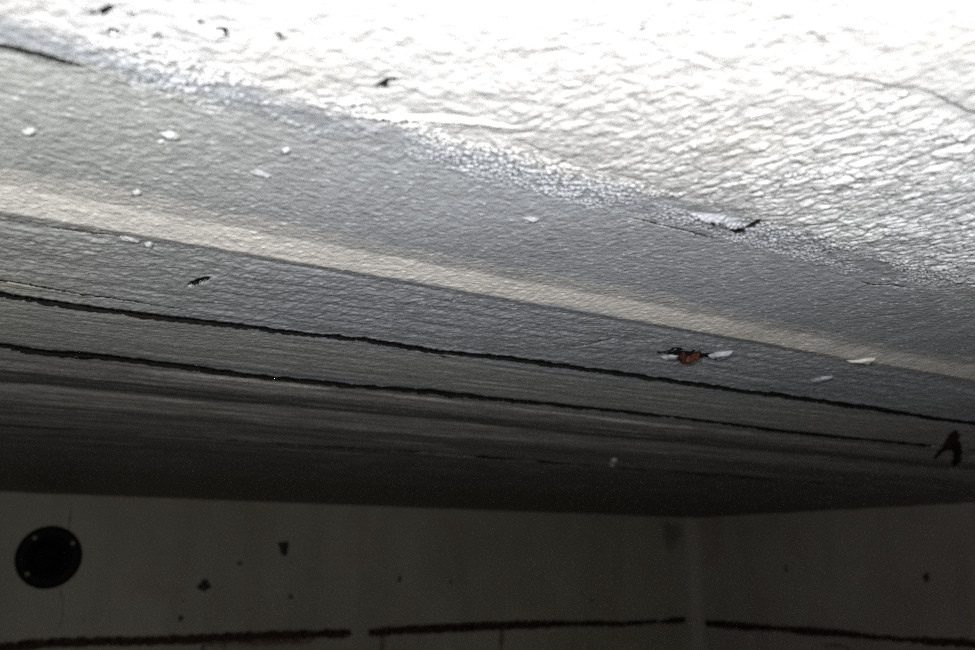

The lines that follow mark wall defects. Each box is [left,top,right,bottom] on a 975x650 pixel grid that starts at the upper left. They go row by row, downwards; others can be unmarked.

crack [188,277,210,285]
crack [0,343,941,447]
crack [0,280,975,426]
spalling [933,430,963,466]